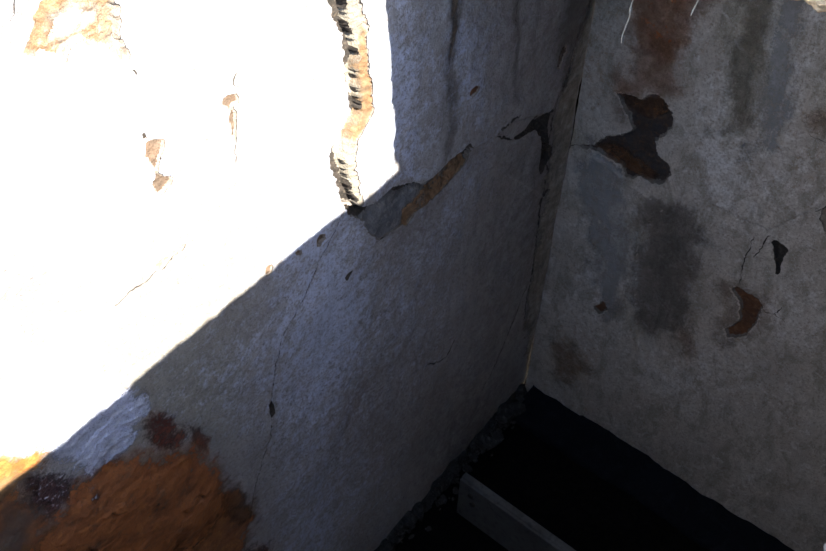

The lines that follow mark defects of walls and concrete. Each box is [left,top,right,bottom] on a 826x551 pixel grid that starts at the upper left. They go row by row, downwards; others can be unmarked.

spalling [23,0,131,66]
corrosion [634,0,693,53]
peeling [142,133,174,196]
peeling [222,93,239,141]
crack [327,0,375,206]
peeling [579,93,674,185]
flaking render [771,240,788,275]
peeling [725,286,763,338]
leakage [4,323,150,478]
corrosion [145,412,210,453]
corrosion [0,445,77,551]
corrosion [177,487,268,551]